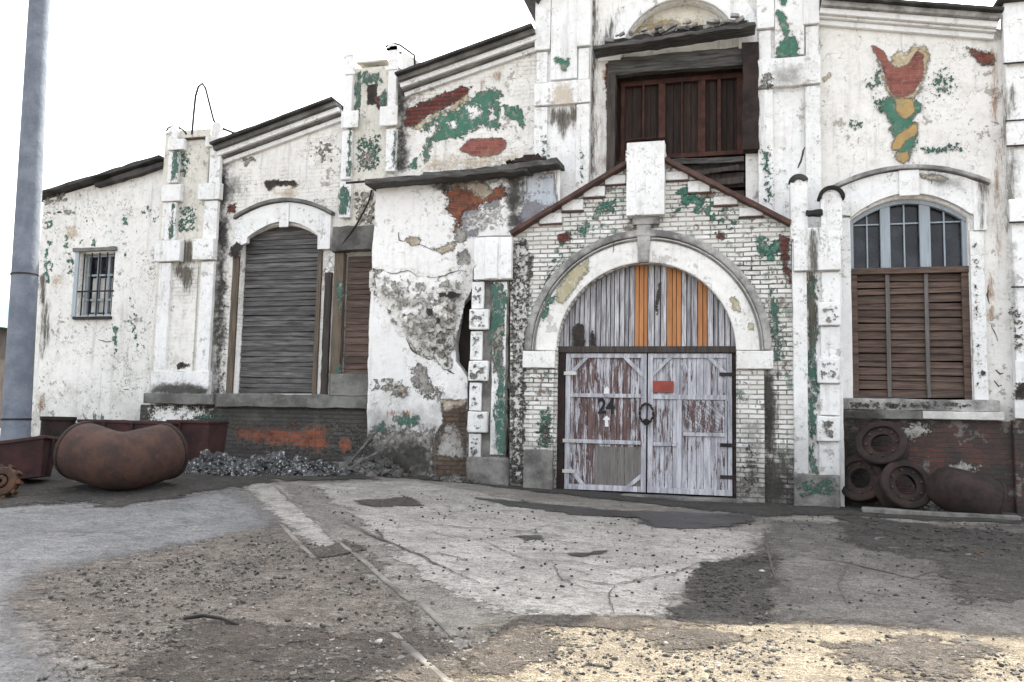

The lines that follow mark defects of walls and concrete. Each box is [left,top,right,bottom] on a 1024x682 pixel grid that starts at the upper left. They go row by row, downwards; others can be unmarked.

flaking render [871,45,925,112]
peeling [310,128,375,177]
flaking render [403,85,526,130]
flaking render [459,137,507,158]
water stain [550,106,577,137]
peeling [891,122,969,164]
water stain [174,241,196,290]
flaking render [232,183,553,485]
flaking render [850,400,976,443]
flaking render [943,459,982,472]